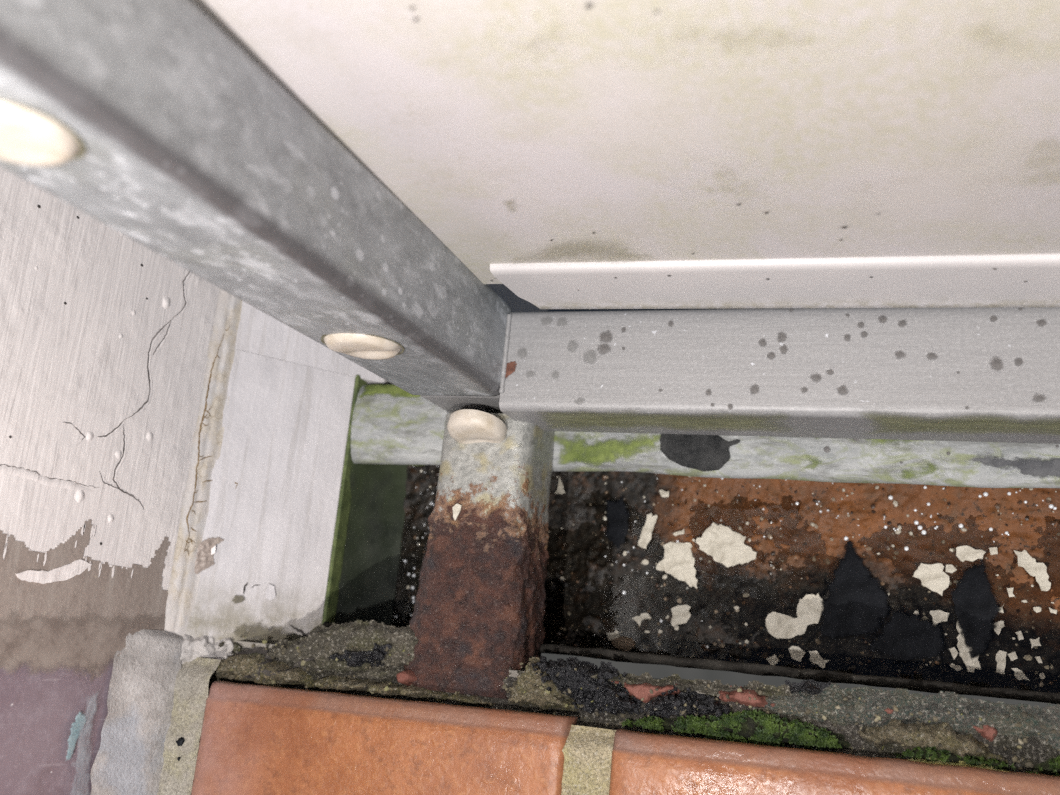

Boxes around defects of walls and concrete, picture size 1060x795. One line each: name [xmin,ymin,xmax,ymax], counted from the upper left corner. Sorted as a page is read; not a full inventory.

crack [0,271,192,510]
peeling [0,519,170,627]
peeling [638,513,757,588]
peeling [913,545,986,596]
peeling [1014,550,1054,613]
peeling [632,605,691,634]
peeling [766,593,829,668]
peeling [913,610,1007,674]